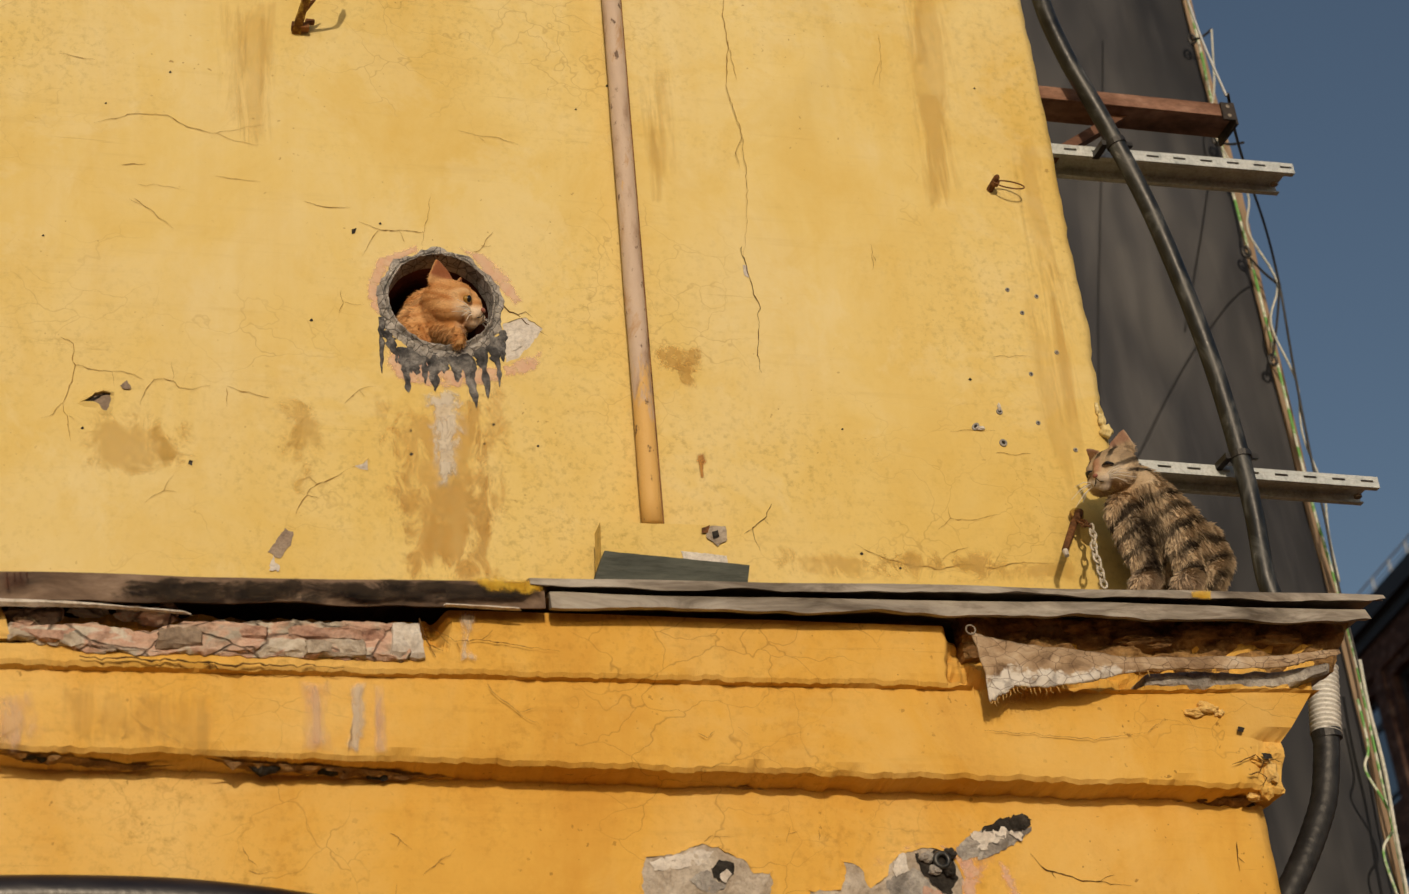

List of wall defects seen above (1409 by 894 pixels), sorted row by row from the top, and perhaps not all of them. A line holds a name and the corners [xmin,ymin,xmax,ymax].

crack [722,0,761,368]
peeling [368,247,417,310]
peeling [389,251,547,387]
spalling [77,380,131,415]
damp [428,391,462,482]
spalling [1184,701,1225,718]
spalling [1196,745,1282,807]
spalling [635,839,778,894]
spalling [804,813,1032,894]